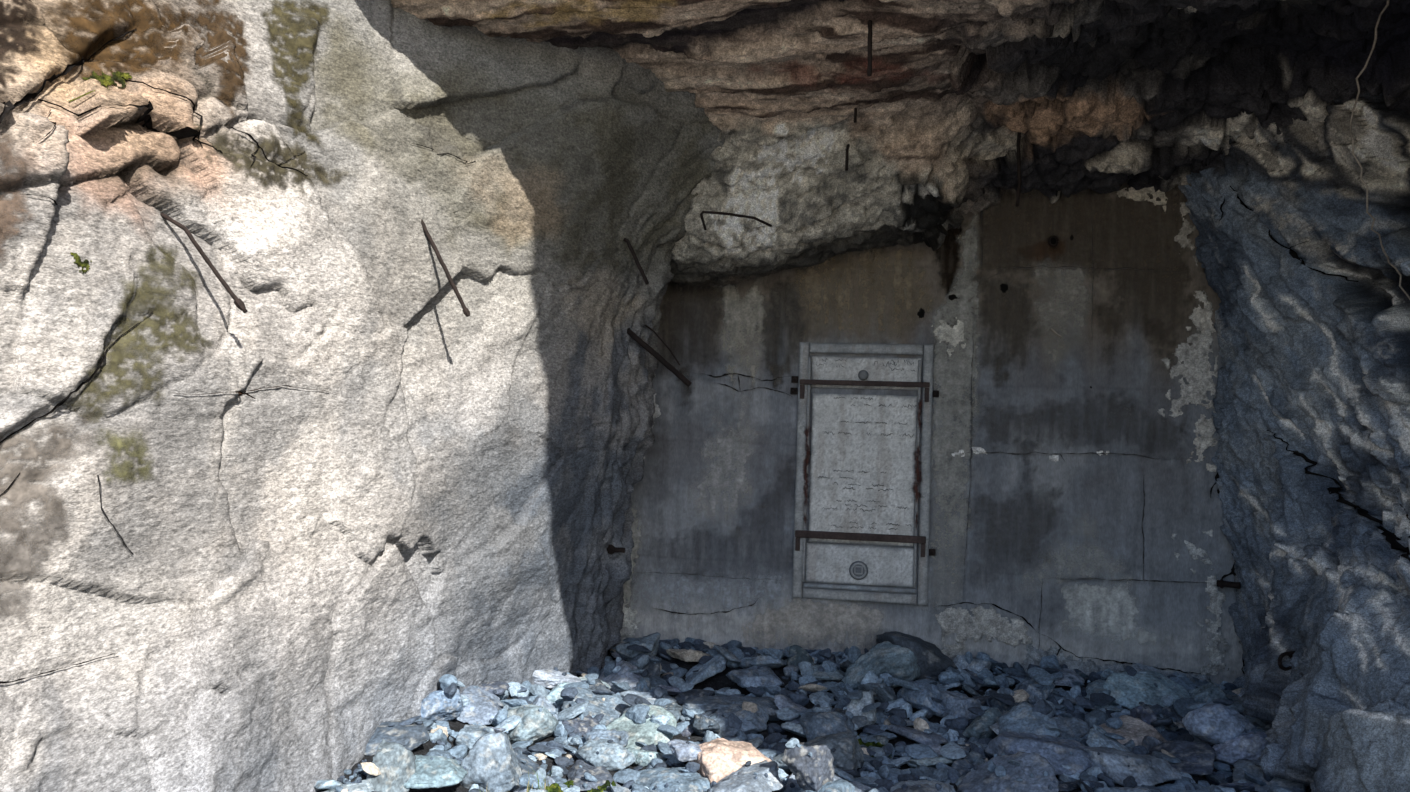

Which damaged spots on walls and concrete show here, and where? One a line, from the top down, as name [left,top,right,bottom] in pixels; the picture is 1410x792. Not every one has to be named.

crack [709,373,787,394]
damp [661,184,1193,645]
peeling [1157,291,1218,472]
rust [803,428,811,523]
rust [912,447,922,527]
crack [632,572,776,615]
spalling [935,605,1033,658]